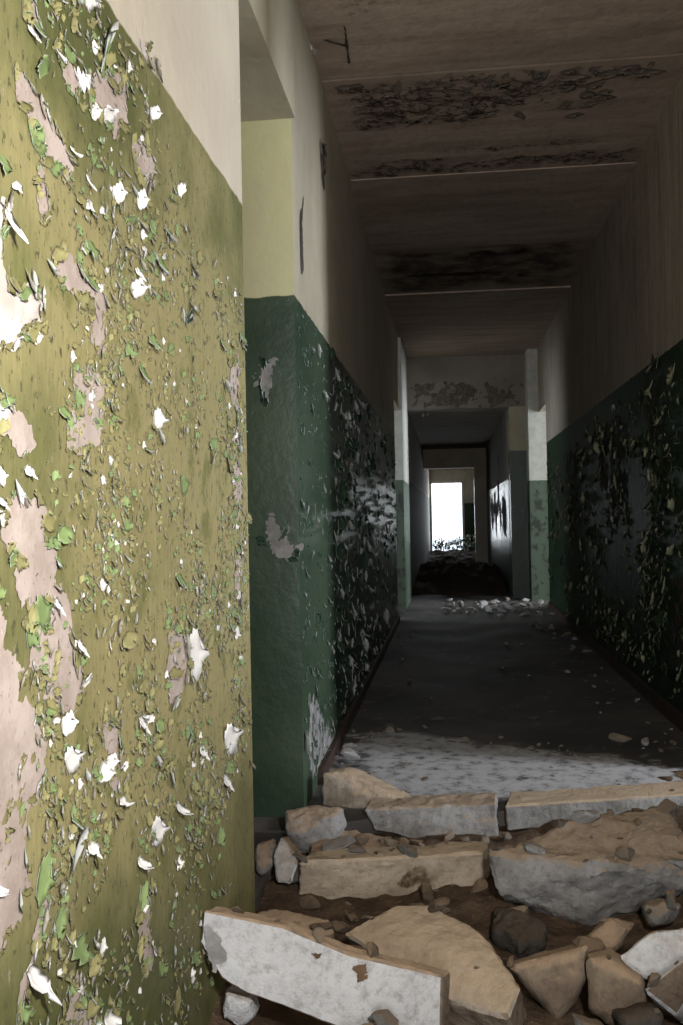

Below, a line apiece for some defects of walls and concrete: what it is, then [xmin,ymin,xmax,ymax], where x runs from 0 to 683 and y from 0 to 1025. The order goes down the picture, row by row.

peeling [0,0,403,1025]
peeling [409,377,523,417]
peeling [546,353,683,683]